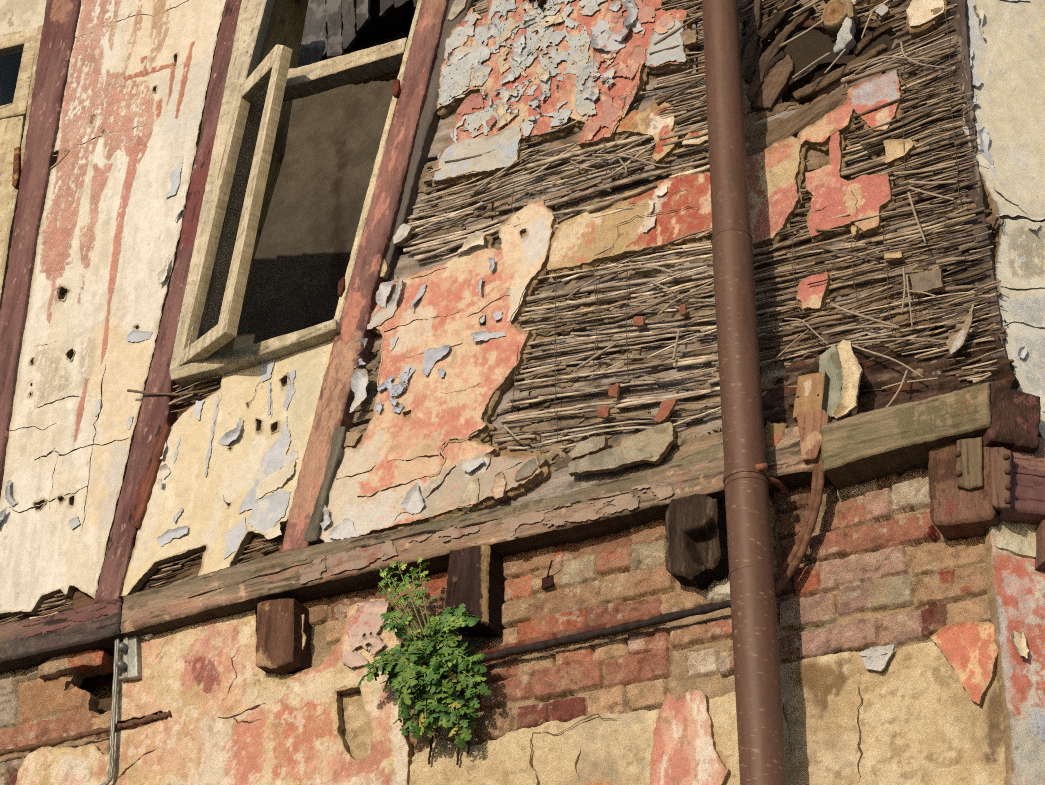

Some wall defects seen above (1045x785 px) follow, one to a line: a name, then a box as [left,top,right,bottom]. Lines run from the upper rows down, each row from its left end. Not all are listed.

flaking render [739,0,824,47]
peeling [349,258,450,413]
flaking render [393,0,721,514]
flaking render [752,0,1005,407]
crack [993,187,1045,234]
crack [1000,284,1045,292]
crack [1003,320,1045,328]
crack [9,364,129,531]
flaking render [138,551,204,592]
flaking render [127,370,242,477]
peeling [223,358,299,565]
crack [188,431,637,599]